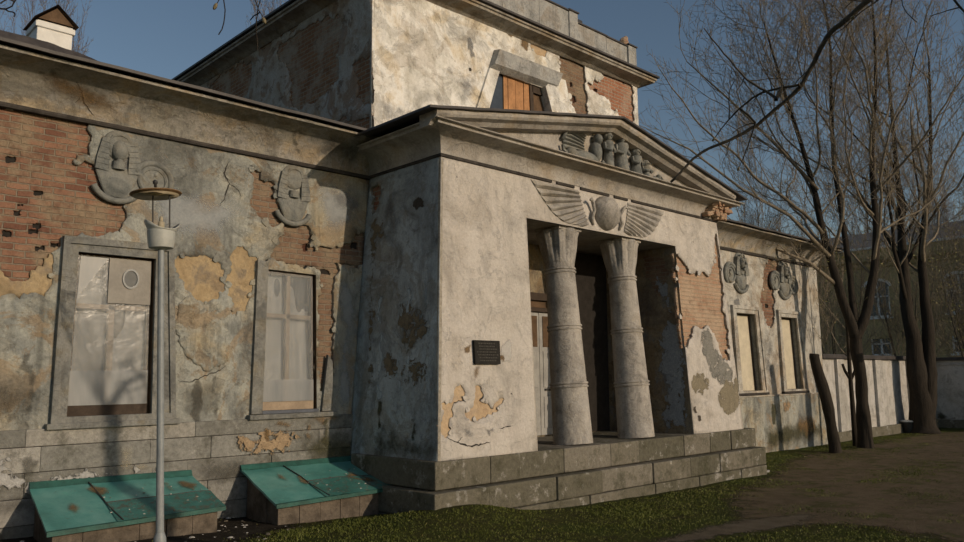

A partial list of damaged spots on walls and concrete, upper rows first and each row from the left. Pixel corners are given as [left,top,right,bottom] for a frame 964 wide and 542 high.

flaking render [261,14,342,110]
flaking render [340,56,375,129]
flaking render [558,56,633,121]
flaking render [0,108,126,299]
flaking render [175,246,257,315]
flaking render [248,166,384,391]
flaking render [368,304,428,391]
flaking render [670,237,740,414]
flaking render [237,430,300,455]
flaking render [437,385,512,438]